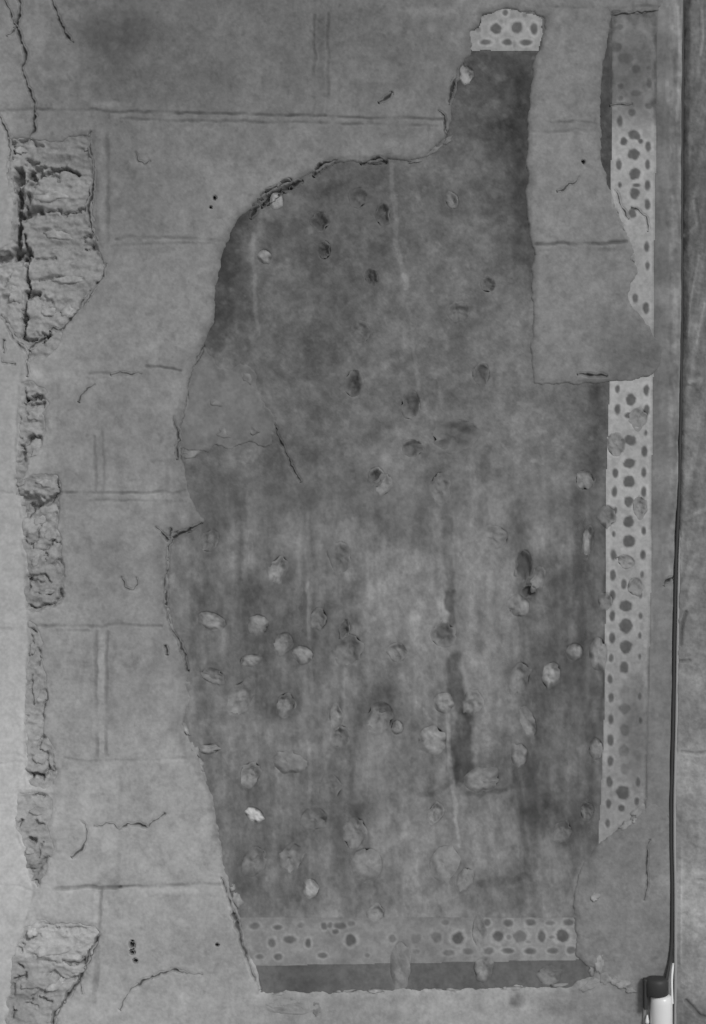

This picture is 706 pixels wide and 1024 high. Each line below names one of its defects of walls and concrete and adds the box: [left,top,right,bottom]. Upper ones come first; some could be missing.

crack [50,0,74,43]
crack [0,0,38,173]
spalling [0,136,104,361]
spalling [15,381,65,887]
crack [120,522,202,672]
hole [514,550,536,599]
crack [71,812,165,859]
spalling [5,920,99,1024]
crack [119,967,202,1010]